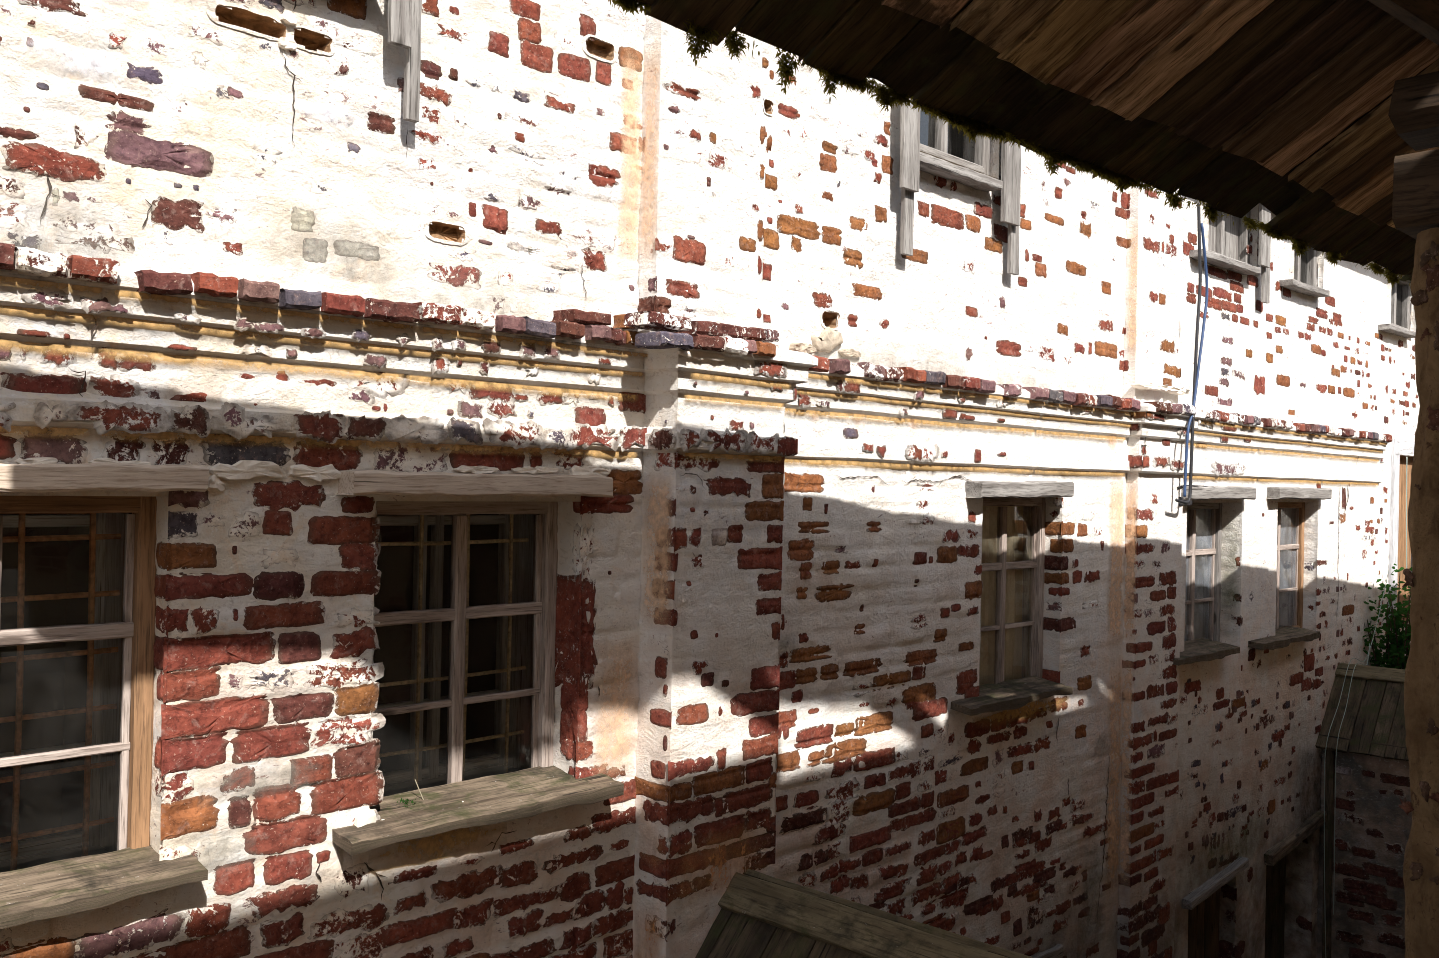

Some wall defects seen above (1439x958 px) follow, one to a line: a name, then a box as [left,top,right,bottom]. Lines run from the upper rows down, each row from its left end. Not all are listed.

peeling [421,0,643,91]
peeling [0,0,377,256]
crack [282,52,301,148]
peeling [21,287,133,315]
peeling [174,312,202,324]
peeling [290,206,380,263]
peeling [1018,249,1047,287]
peeling [917,163,1197,267]
peeling [1066,260,1111,295]
peeling [1149,291,1166,305]
peeling [1186,233,1439,432]
peeling [0,316,1388,958]